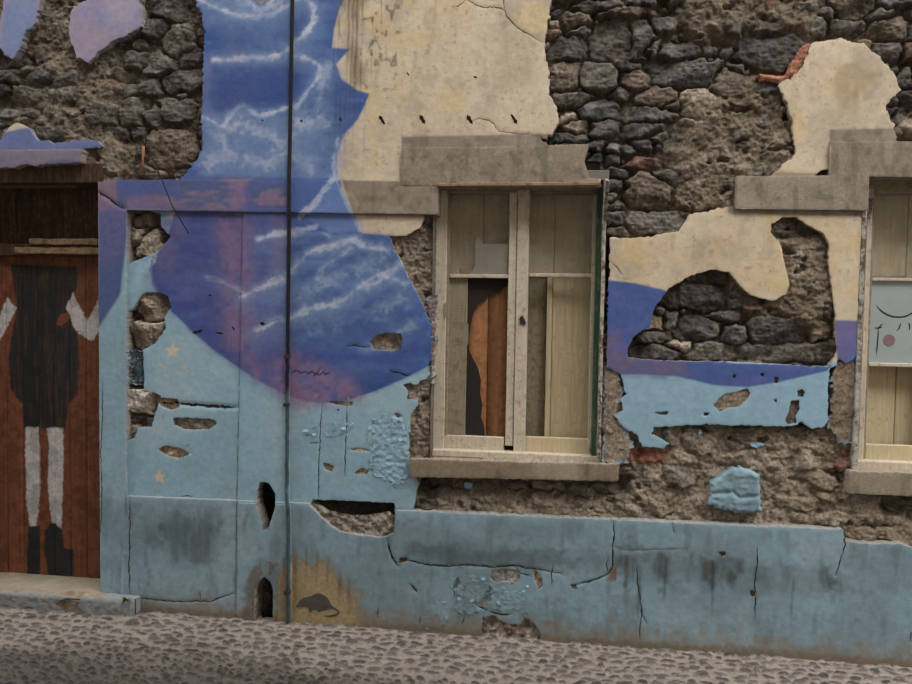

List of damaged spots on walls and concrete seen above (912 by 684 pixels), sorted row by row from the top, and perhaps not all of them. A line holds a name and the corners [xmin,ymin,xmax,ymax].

crack [452,0,539,41]
spalling [0,0,205,182]
spalling [131,211,171,262]
spalling [391,215,437,323]
spalling [414,0,912,547]
spalling [124,292,217,438]
spalling [371,333,403,351]
peeling [351,379,431,489]
spalling [311,500,395,537]
crack [388,521,682,638]